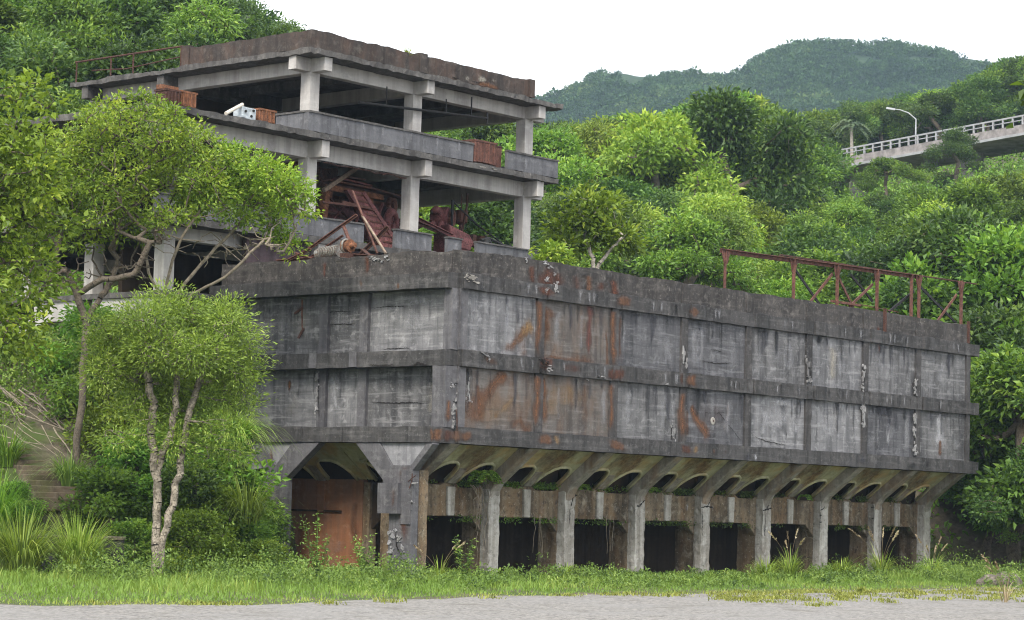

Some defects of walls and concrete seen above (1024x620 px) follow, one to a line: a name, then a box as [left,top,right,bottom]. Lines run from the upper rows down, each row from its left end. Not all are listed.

spalling [543,261,559,293]
rust [508,267,560,348]
spalling [450,377,473,430]
rust [678,375,710,474]
spalling [387,528,405,553]